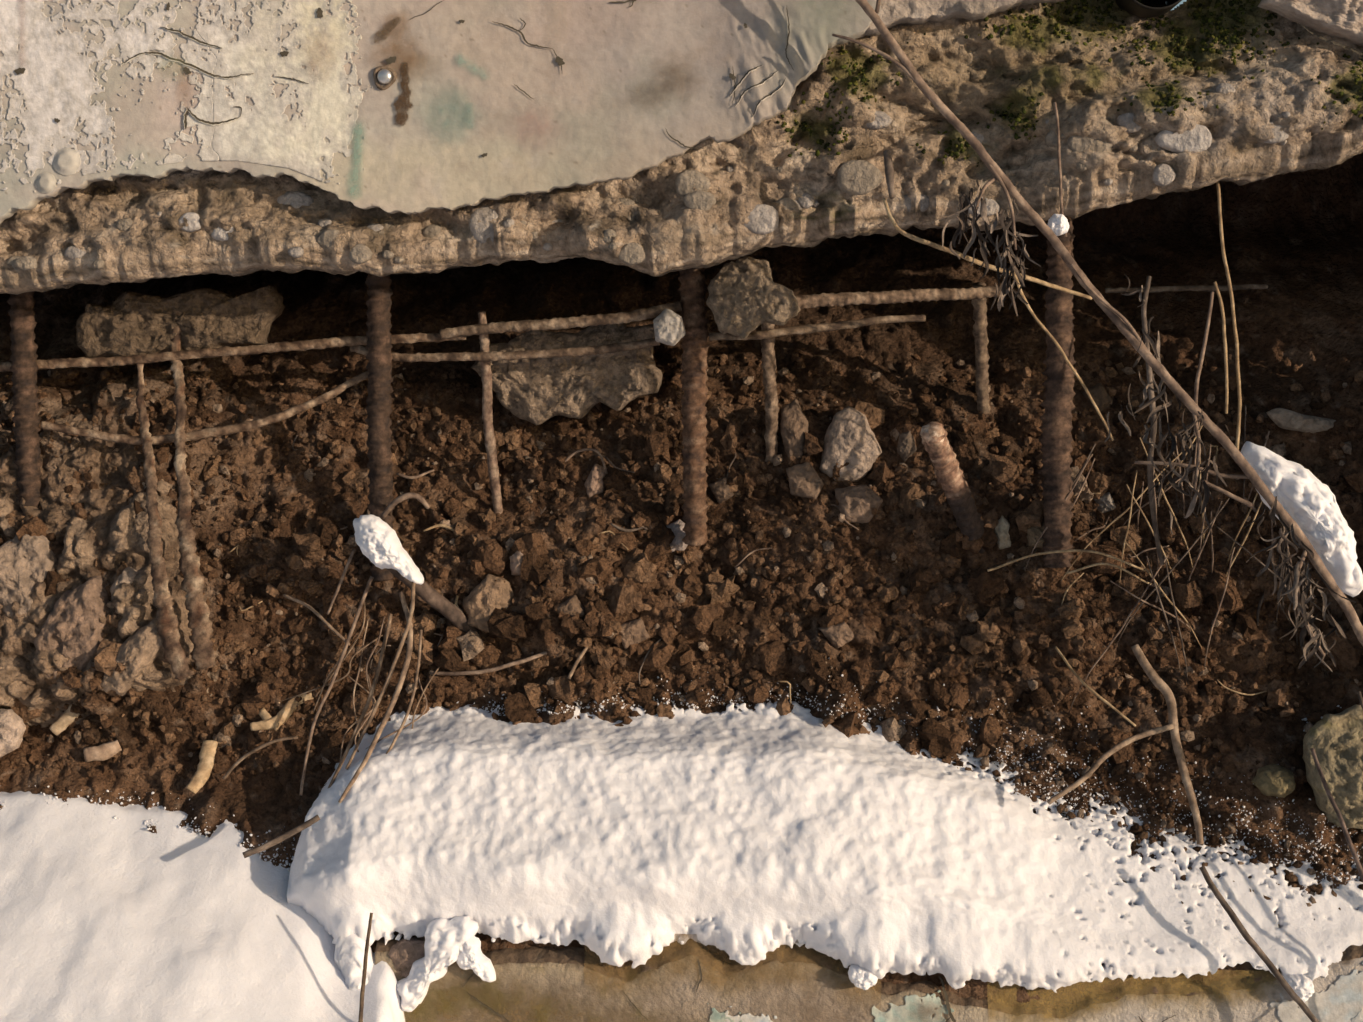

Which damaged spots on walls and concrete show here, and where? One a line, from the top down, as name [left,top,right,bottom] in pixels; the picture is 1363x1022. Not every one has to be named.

spalling [0,0,1363,295]
spalling [0,394,223,728]
peeling [708,1003,777,1022]
peeling [872,990,954,1022]
peeling [1269,962,1363,1022]